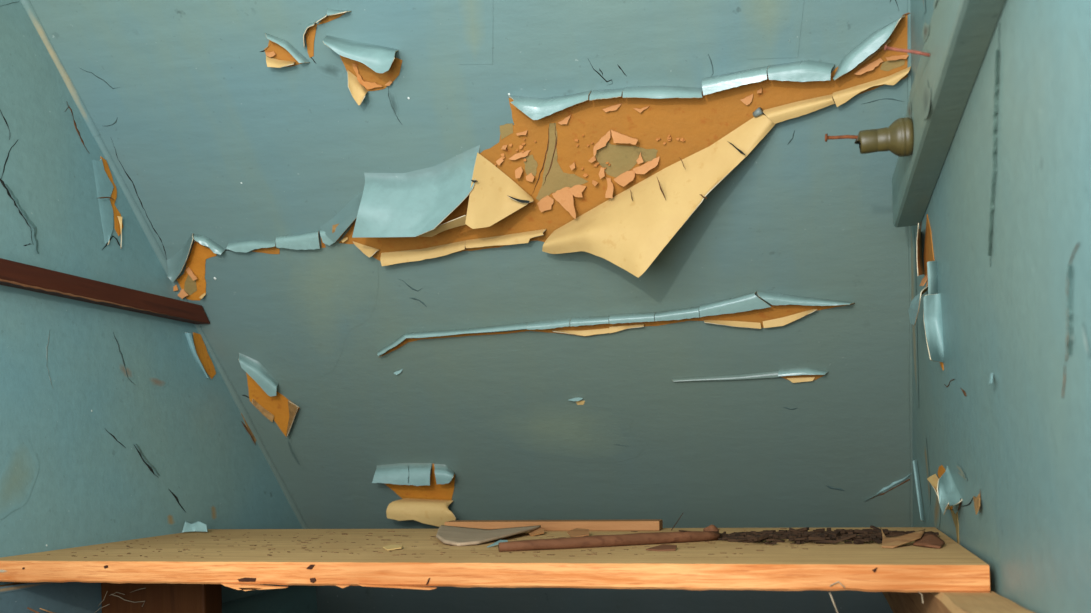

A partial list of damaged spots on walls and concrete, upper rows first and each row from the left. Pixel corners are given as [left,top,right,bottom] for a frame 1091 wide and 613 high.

crack [0,110,39,254]
peeling [167,8,911,300]
crack [988,23,1000,267]
peeling [185,332,216,379]
peeling [238,353,303,469]
peeling [377,290,855,357]
peeling [672,367,829,383]
peeling [908,214,944,370]
crack [1062,243,1080,398]
peeling [372,463,456,527]
peeling [912,459,980,544]